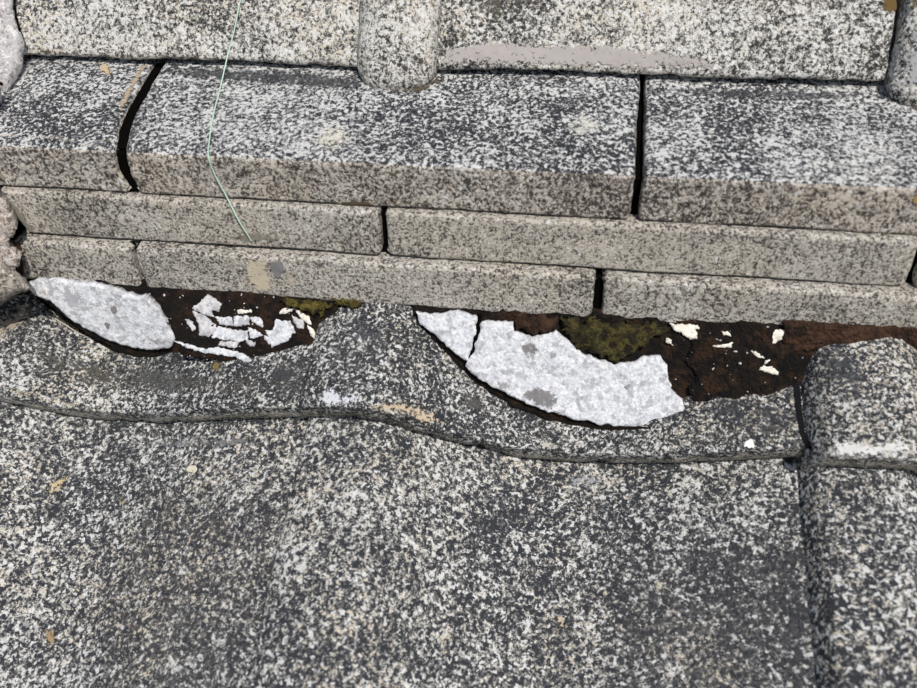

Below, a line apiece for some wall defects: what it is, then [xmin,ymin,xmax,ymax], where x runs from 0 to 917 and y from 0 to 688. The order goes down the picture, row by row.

crack [116,63,164,192]
flaking render [172,294,316,363]
flaking render [666,323,700,345]
flaking render [772,329,785,344]
flaking render [752,351,779,375]